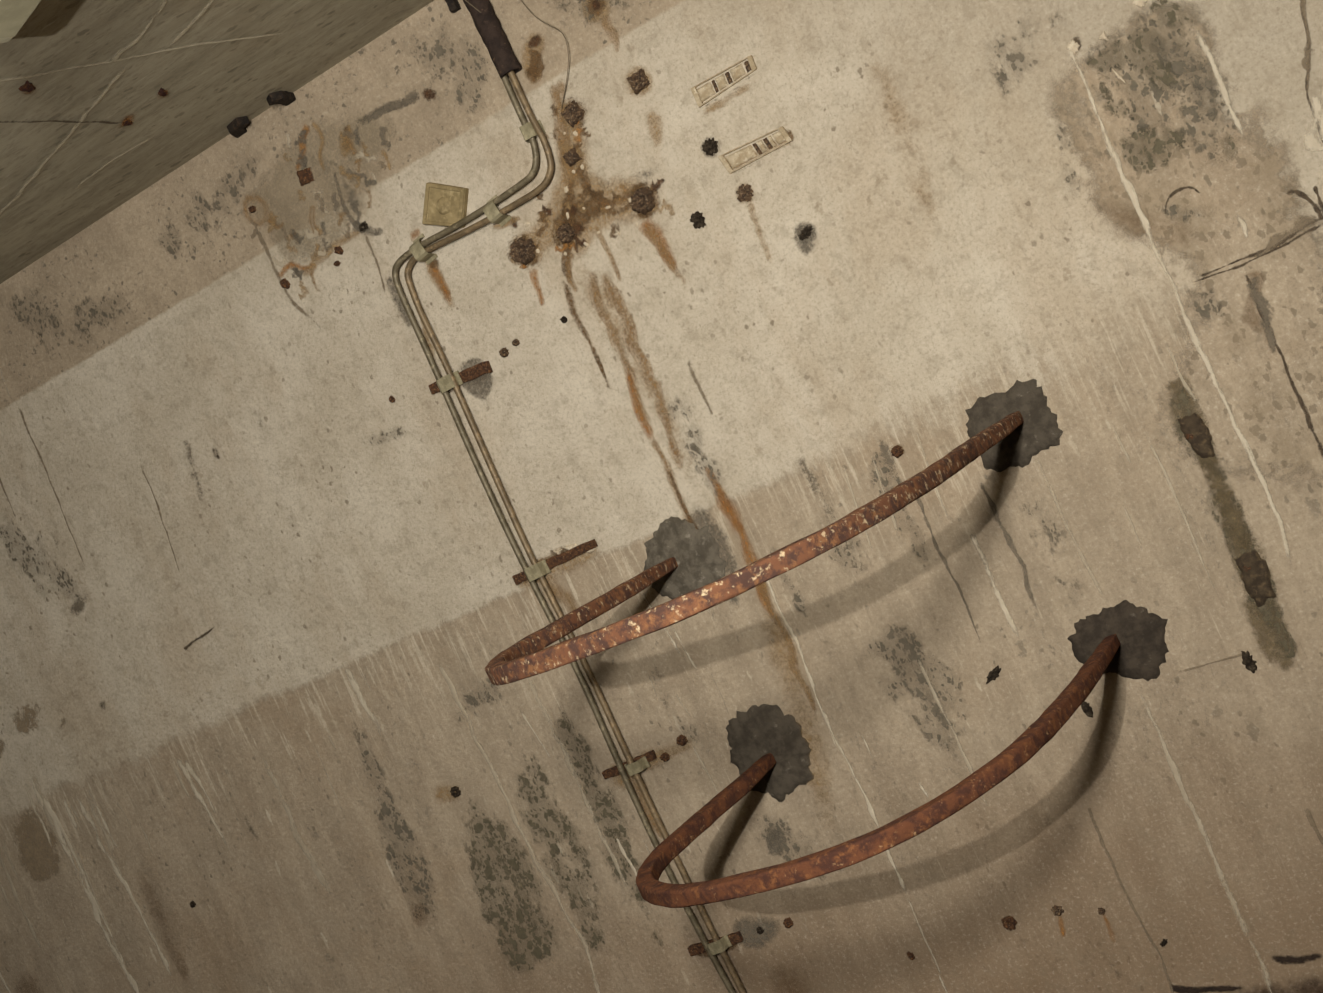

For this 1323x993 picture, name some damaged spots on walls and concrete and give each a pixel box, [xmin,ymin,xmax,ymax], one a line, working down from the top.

crack [0,118,117,126]
leakage [161,97,416,316]
rust [495,35,697,529]
leakage [996,21,1031,93]
crack [1195,186,1323,455]
crack [1300,0,1323,151]
spalling [553,544,598,555]
rust [708,469,756,563]
rust [756,582,819,742]
leakage [346,669,435,918]
leakage [466,713,604,970]
leakage [558,712,647,908]